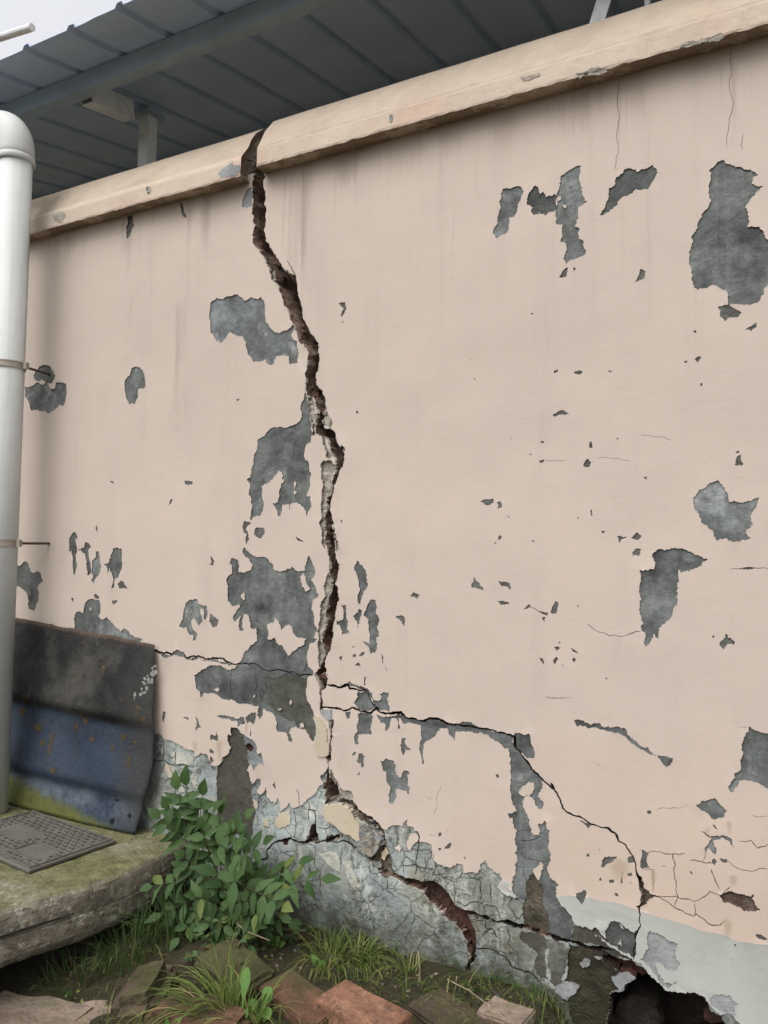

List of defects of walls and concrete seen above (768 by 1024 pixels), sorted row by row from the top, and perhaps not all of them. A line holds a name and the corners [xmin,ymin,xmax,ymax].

peeling [493,165,587,278]
peeling [600,165,658,215]
peeling [689,160,768,321]
peeling [209,294,299,365]
peeling [25,365,67,414]
peeling [693,480,759,542]
peeling [69,532,142,642]
crack [155,173,768,1024]
peeling [617,532,708,646]
peeling [160,387,680,1024]
peeling [728,726,768,792]
spalling [719,891,760,912]